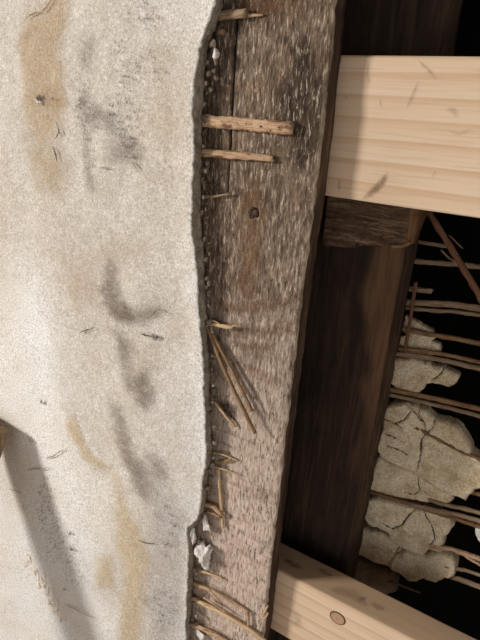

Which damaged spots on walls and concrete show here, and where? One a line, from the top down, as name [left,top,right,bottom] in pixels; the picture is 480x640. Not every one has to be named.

water stain [75,49,167,168]
spalling [202,16,225,107]
crack [383,404,436,544]